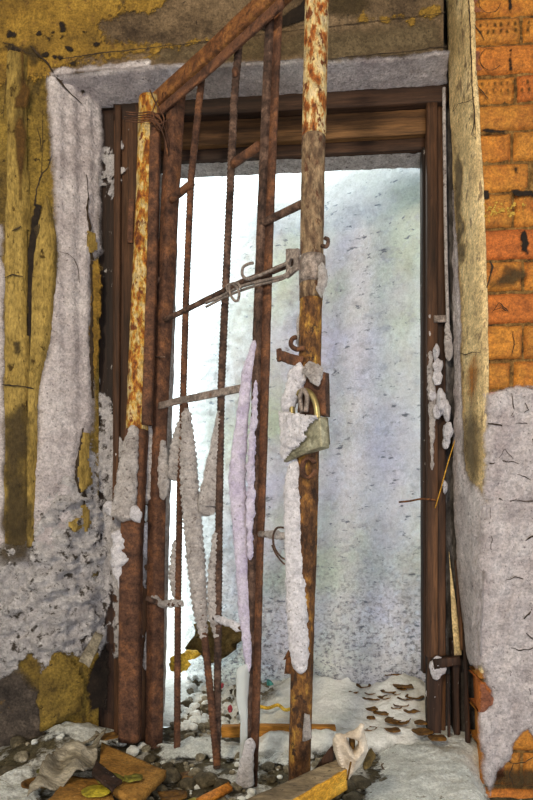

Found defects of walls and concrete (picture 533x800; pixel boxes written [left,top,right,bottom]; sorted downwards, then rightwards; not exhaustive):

spalling [86,174,103,398]
peeling [68,428,93,532]
spalling [36,632,110,731]